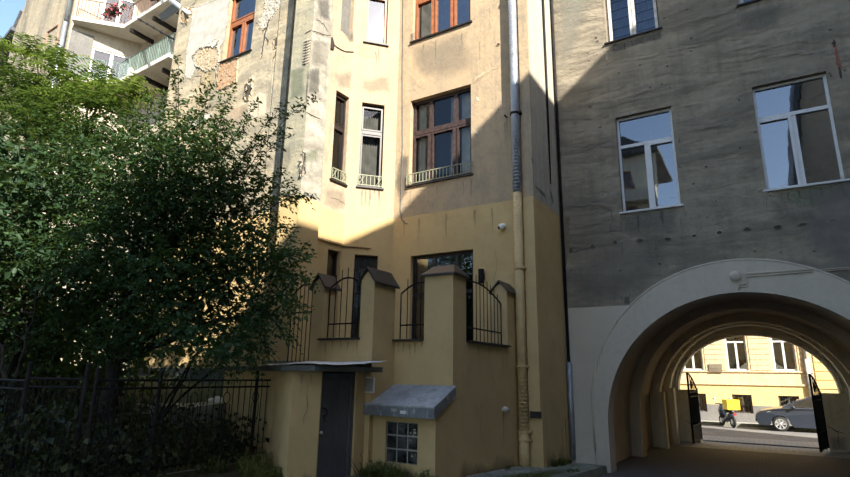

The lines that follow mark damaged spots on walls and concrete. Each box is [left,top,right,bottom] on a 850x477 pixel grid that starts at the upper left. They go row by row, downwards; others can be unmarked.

peeling [180,0,255,102]
peeling [256,0,281,31]